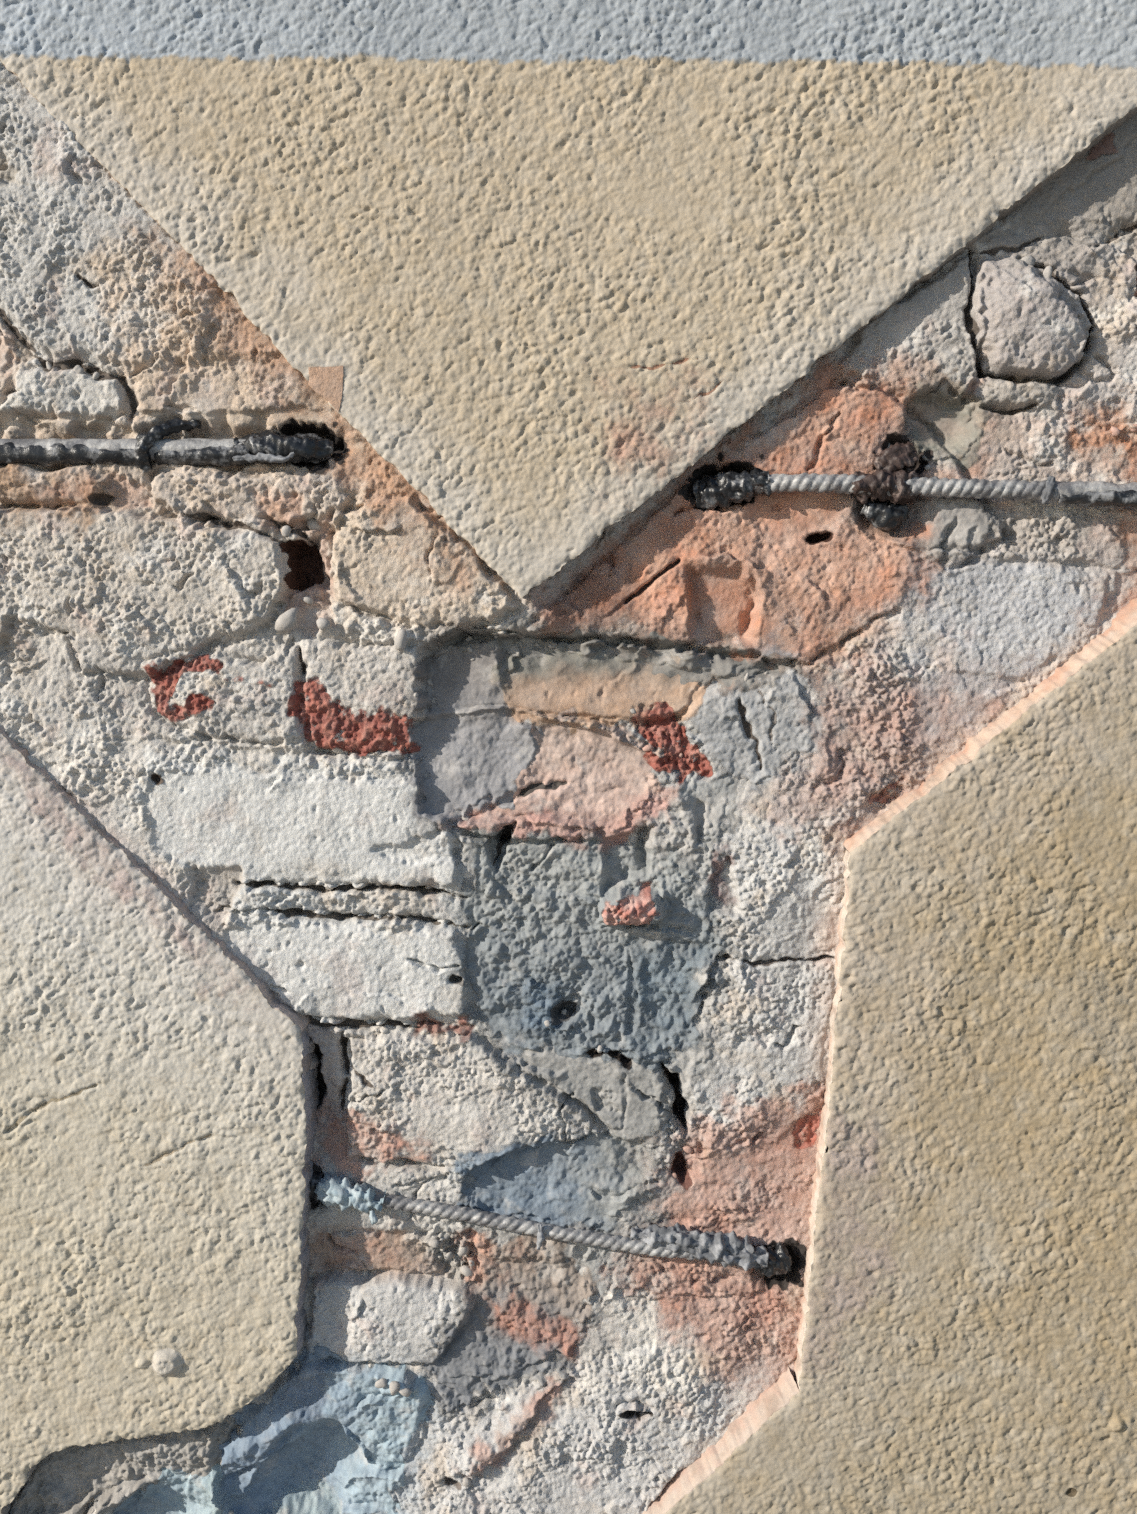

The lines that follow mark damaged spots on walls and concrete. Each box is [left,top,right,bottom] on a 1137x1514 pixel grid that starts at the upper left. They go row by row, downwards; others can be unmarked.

crack [77,275,99,288]
crack [0,309,138,420]
crack [964,238,1093,415]
spalling [144,654,271,722]
spalling [287,679,420,757]
spalling [632,702,713,783]
crack [493,781,567,865]
spalling [868,778,903,805]
crack [238,880,468,927]
spalling [602,882,658,926]
crack [586,1049,686,1127]
spalling [792,1109,822,1149]